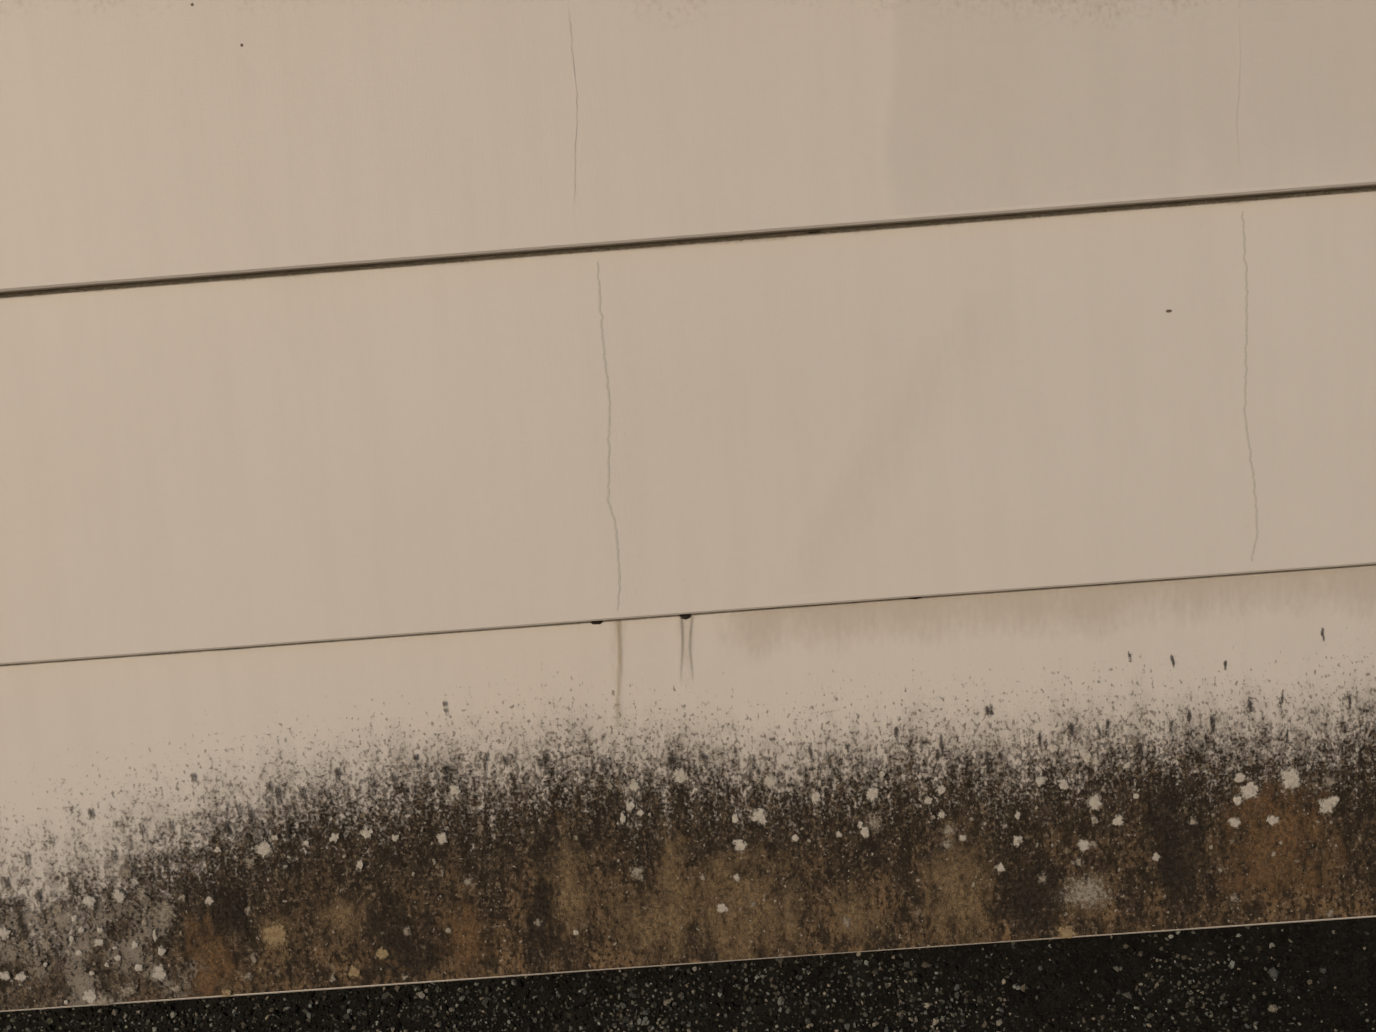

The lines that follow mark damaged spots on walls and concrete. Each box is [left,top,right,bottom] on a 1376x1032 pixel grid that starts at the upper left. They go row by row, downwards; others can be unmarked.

crack [596,262,621,611]
crack [1241,211,1258,561]
damp [0,689,1376,1011]